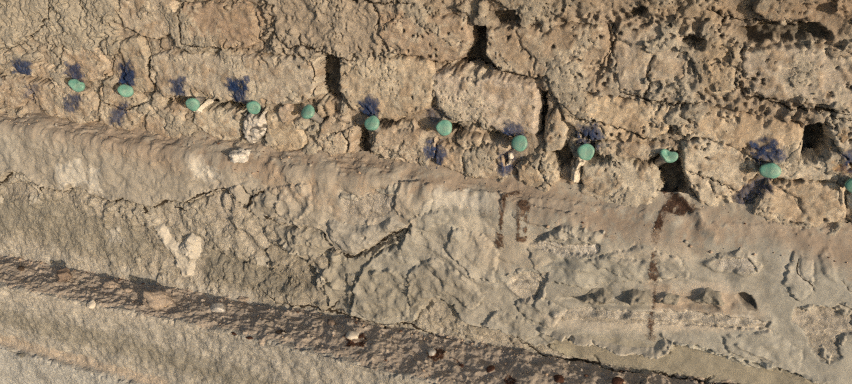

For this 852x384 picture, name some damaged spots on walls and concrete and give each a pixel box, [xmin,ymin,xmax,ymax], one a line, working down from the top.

crack [350,0,409,31]
crack [101,0,355,125]
crack [619,55,700,124]
crack [733,65,852,122]
crack [566,115,660,142]
spalling [254,243,328,289]
rust [495,191,530,249]
spalling [506,268,547,303]
spalling [533,225,605,257]
spalling [554,287,770,329]
rust [646,191,699,340]
spalling [792,302,852,365]